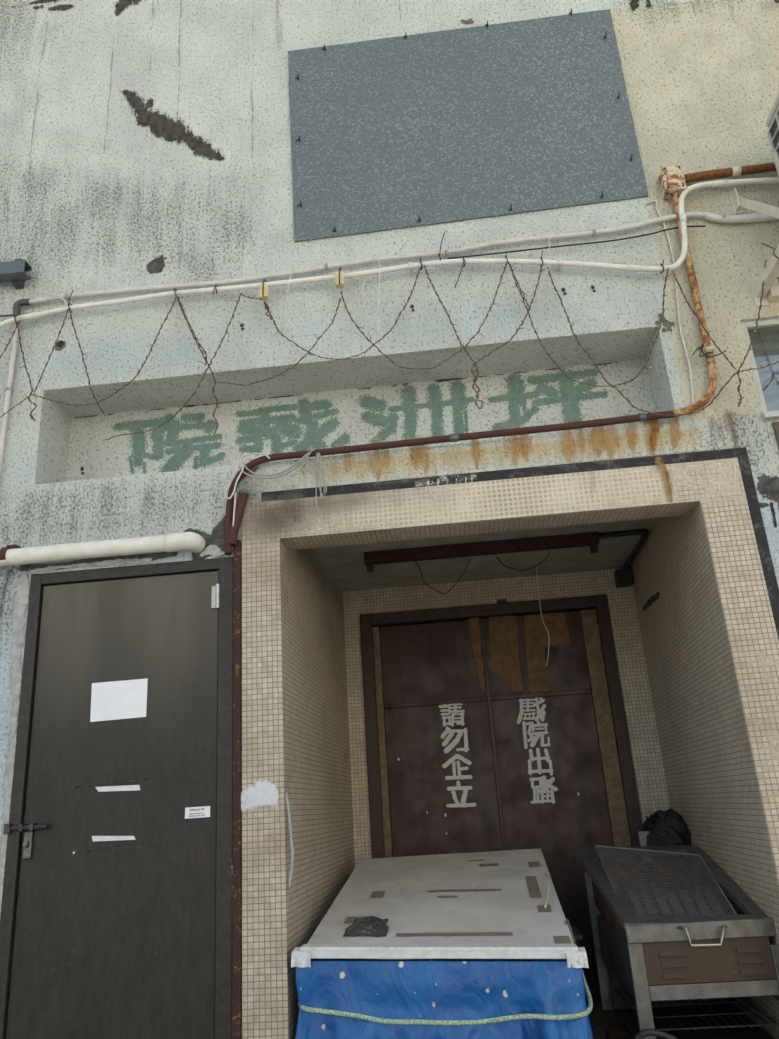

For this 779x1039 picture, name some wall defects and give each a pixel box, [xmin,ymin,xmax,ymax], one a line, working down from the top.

peeling [630,0,651,10]
corrosion [411,445,428,473]
corrosion [563,419,616,461]
corrosion [627,417,679,501]